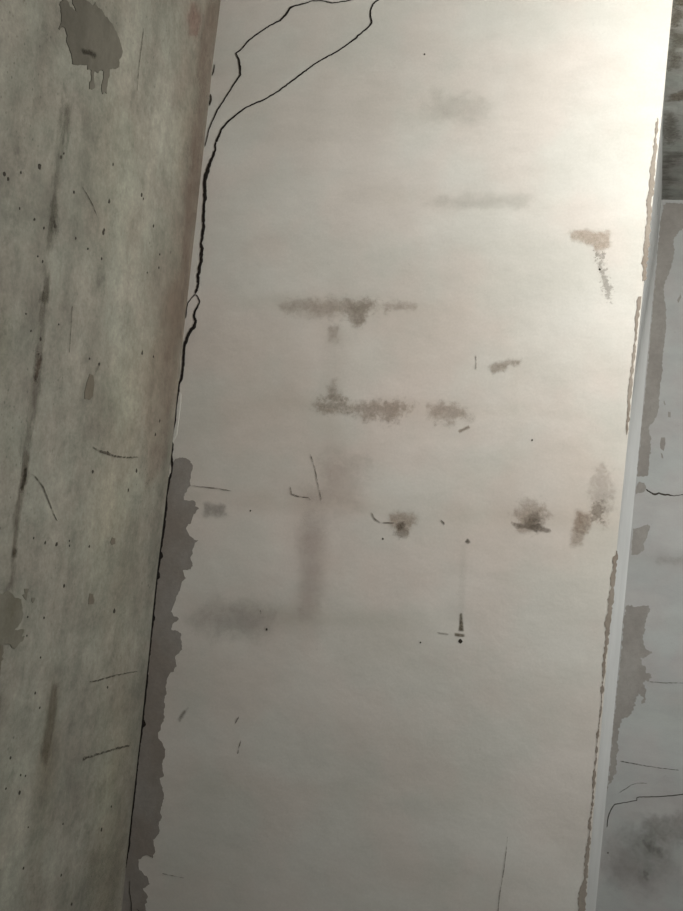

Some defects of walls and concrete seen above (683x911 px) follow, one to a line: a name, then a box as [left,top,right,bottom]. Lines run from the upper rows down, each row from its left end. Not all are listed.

flaking render [636,118,683,494]
crack [125,0,379,911]
flaking render [631,524,650,555]
crack [646,488,683,496]
flaking render [122,457,199,911]
flaking render [607,605,652,789]
crack [607,761,683,826]